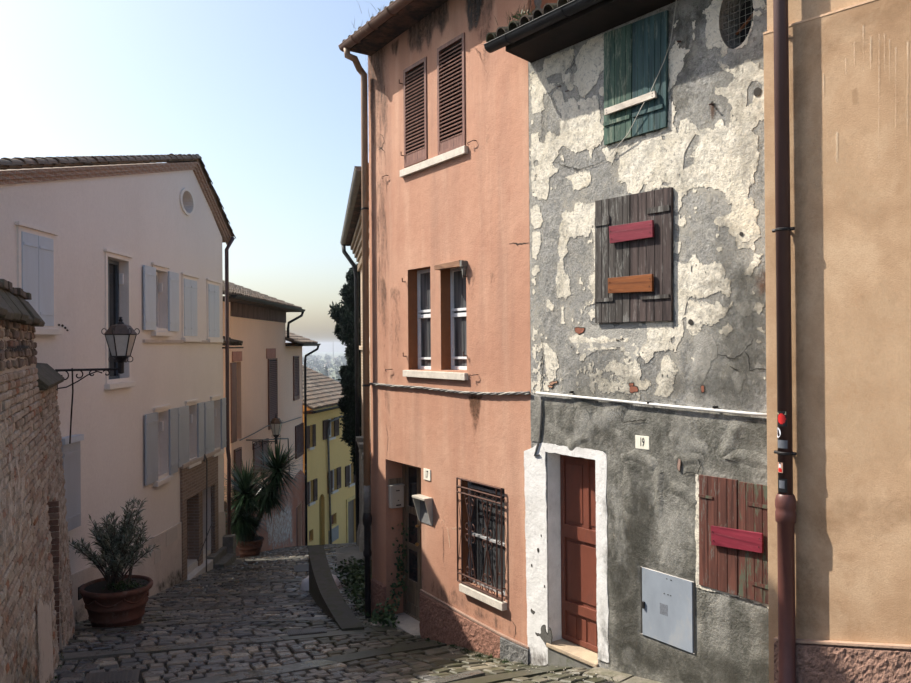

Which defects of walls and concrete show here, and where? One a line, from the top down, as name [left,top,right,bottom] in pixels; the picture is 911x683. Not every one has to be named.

damp [466,0,492,31]
damp [368,41,398,110]
peeling [529,0,767,401]
crack [718,340,766,371]